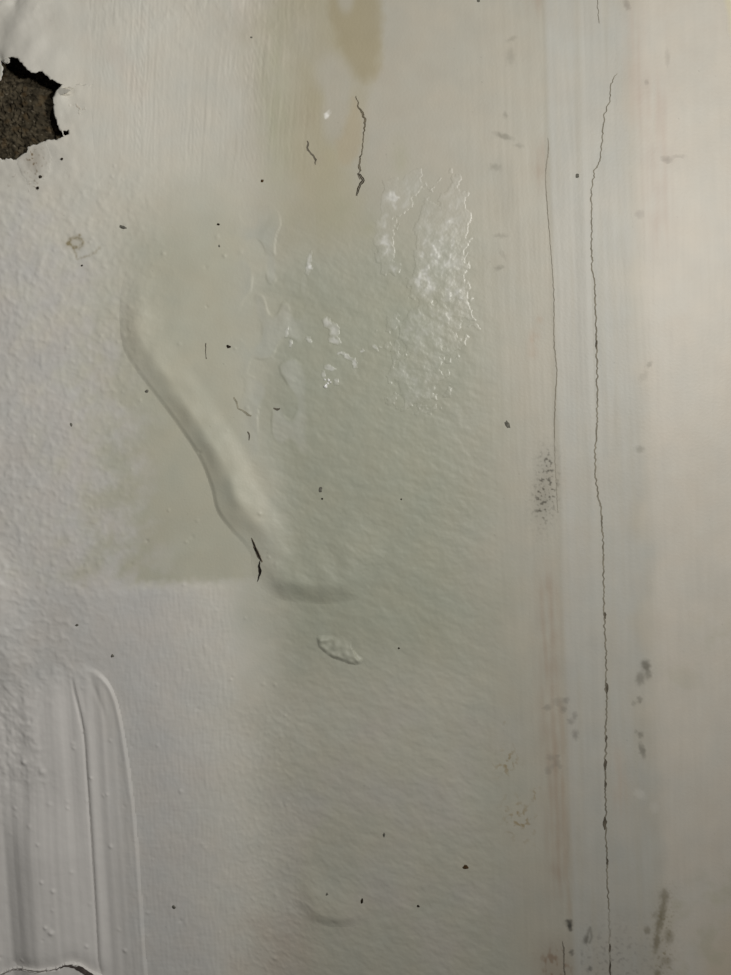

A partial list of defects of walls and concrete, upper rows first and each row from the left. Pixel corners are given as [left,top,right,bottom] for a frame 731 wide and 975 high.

peeling [0,0,97,195]
water stain [231,0,481,416]
crack [355,97,366,196]
water stain [525,432,566,542]
crack [590,74,617,975]
crack [1,965,93,975]